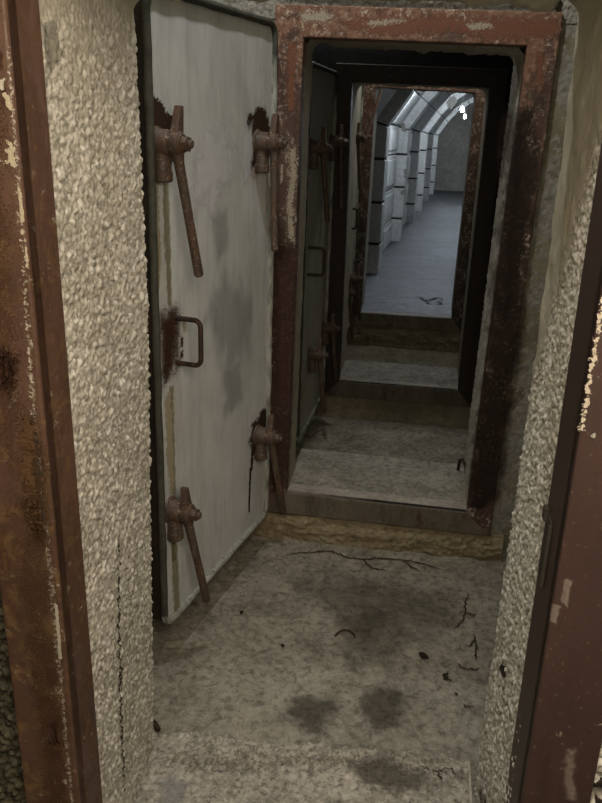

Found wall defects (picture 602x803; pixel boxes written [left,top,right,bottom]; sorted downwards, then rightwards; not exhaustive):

rust [340,11,564,87]
peeling [0,78,13,111]
peeling [3,139,17,168]
peeling [17,183,25,223]
rust [0,90,43,483]
rust [469,109,537,509]
crack [283,550,452,572]
crack [444,594,481,707]
leakage [288,698,331,731]
leakage [363,688,400,724]
leakage [356,758,424,790]